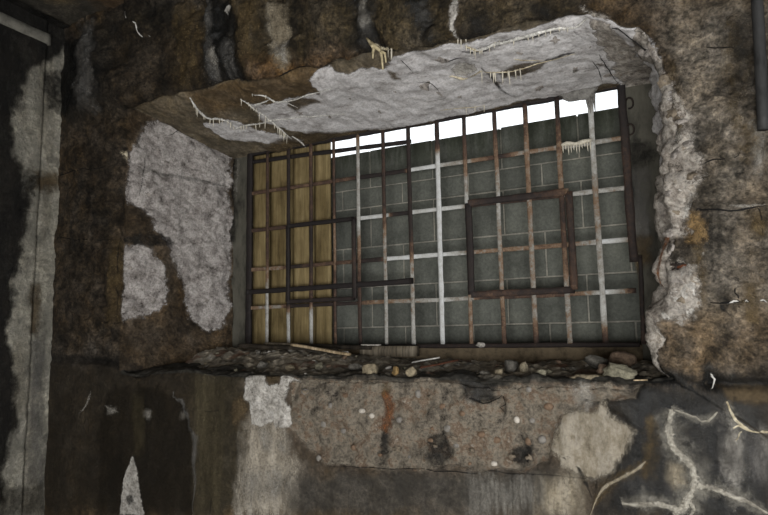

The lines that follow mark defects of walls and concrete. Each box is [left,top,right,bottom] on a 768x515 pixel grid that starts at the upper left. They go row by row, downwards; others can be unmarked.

water stain [0,0,90,504]
spalling [121,120,234,331]
efflorescence [266,4,291,65]
water stain [288,97,320,111]
water stain [265,128,406,153]
spalling [204,8,704,378]
water stain [500,62,544,78]
corrosion [380,391,396,465]
spalling [244,374,641,480]
crack [622,401,768,515]